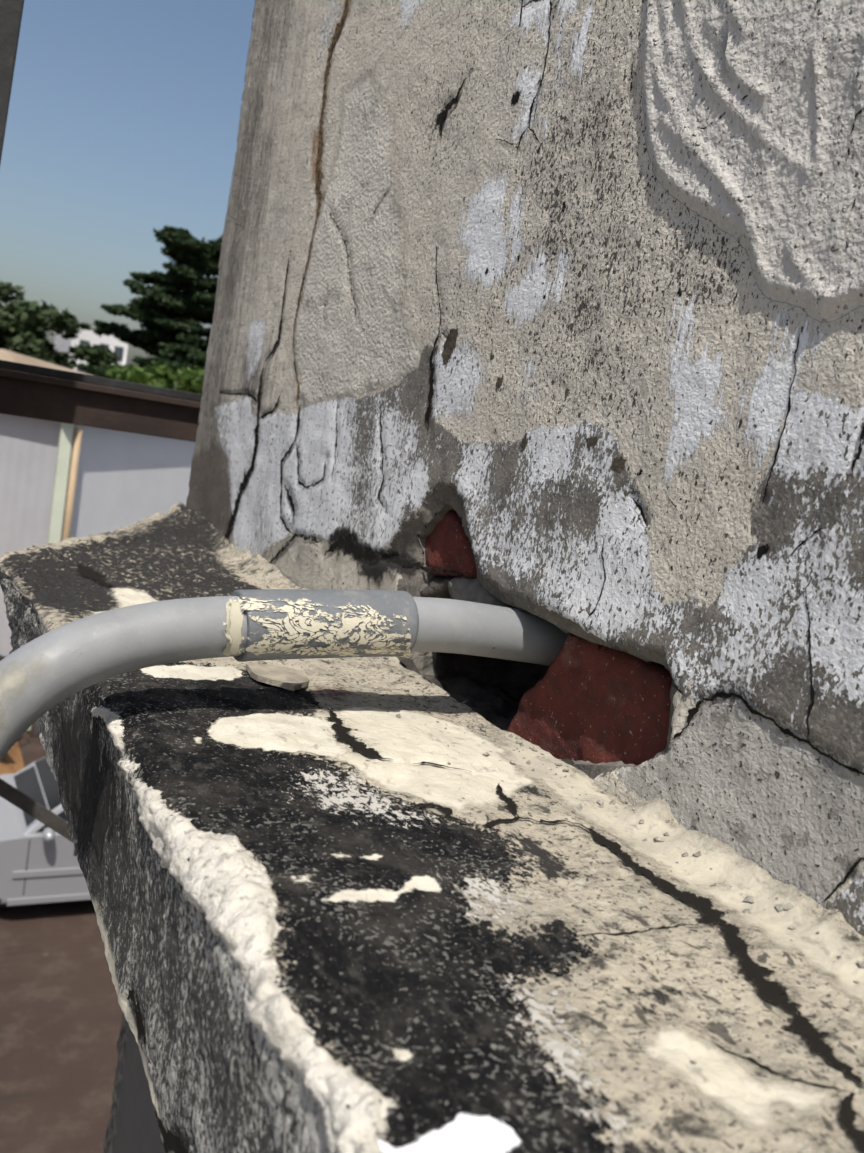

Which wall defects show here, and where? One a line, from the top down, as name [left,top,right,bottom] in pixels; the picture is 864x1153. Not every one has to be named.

crack [495,0,559,151]
crack [219,0,474,579]
peeling [215,285,864,945]
crack [669,578,864,775]
crack [762,332,801,504]
crack [790,528,822,555]
crack [851,426,864,477]
peeling [91,706,397,1153]
peeling [473,970,660,1147]
crack [404,783,864,1150]